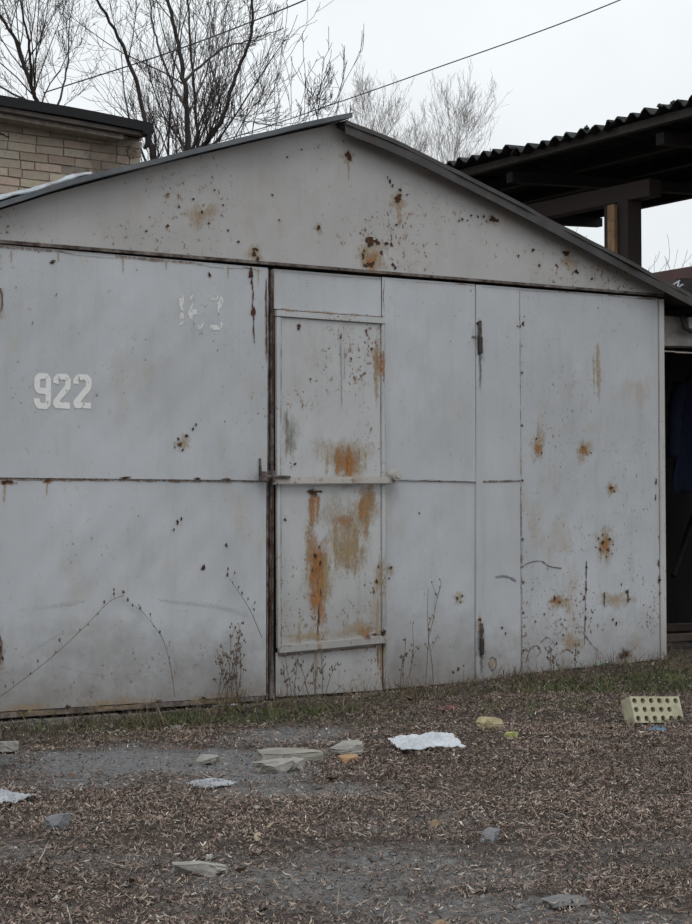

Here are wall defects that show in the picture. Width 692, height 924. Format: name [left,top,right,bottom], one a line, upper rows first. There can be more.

corrosion [246,237,393,403]
corrosion [326,446,366,485]
corrosion [268,488,392,683]